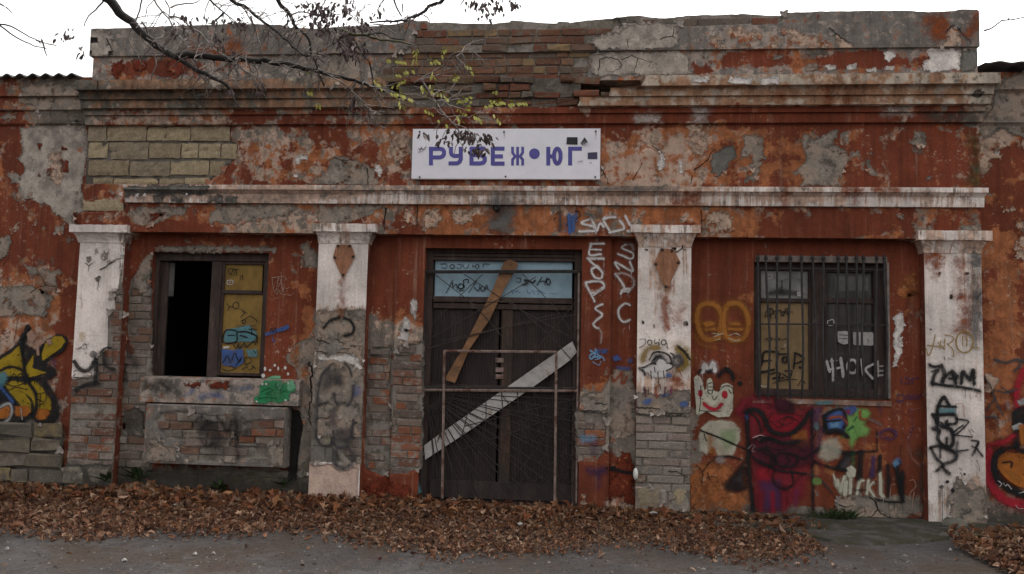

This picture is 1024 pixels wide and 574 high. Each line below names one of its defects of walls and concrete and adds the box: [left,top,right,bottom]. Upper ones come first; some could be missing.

flaking render [377,9,896,107]
crack [598,26,676,72]
peeling [923,25,978,73]
flaking render [0,82,298,259]
flaking render [293,154,383,185]
flaking render [686,107,767,183]
flaking render [792,129,877,186]
flaking render [971,70,1024,178]
flaking render [0,240,425,499]
peeling [892,313,906,367]
flaking render [574,368,691,512]